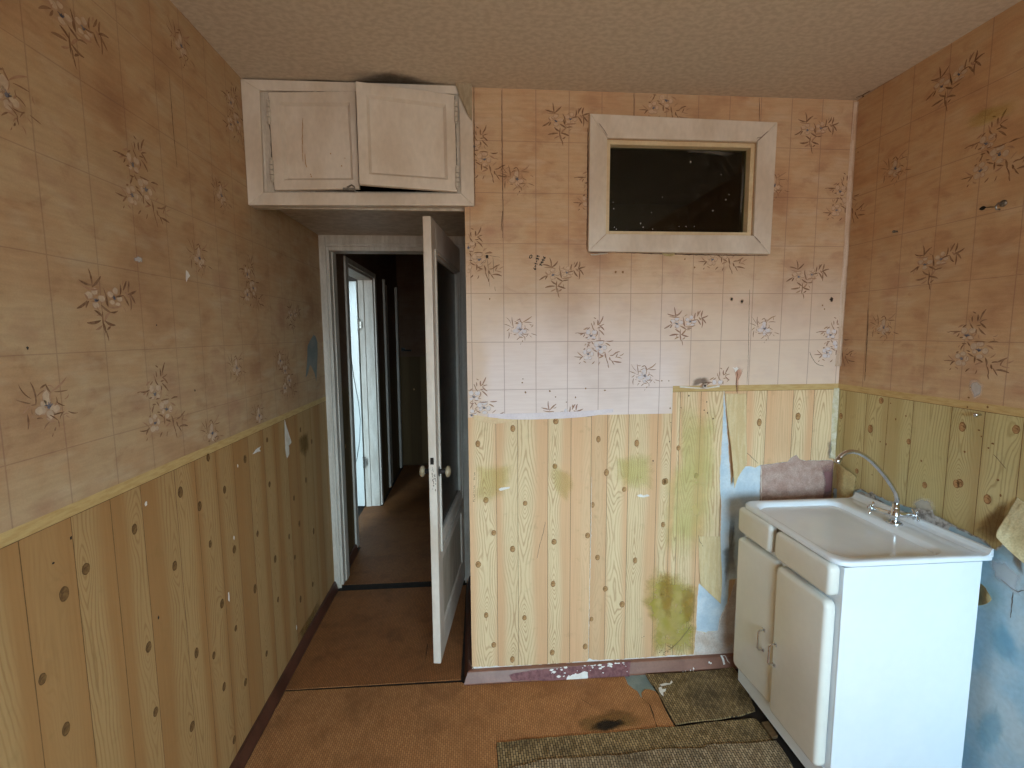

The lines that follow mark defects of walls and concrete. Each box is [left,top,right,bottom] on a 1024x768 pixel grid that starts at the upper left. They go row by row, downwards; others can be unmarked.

flaking render [472,394,762,698]
water stain [643,580,693,655]
flaking render [852,489,1024,768]